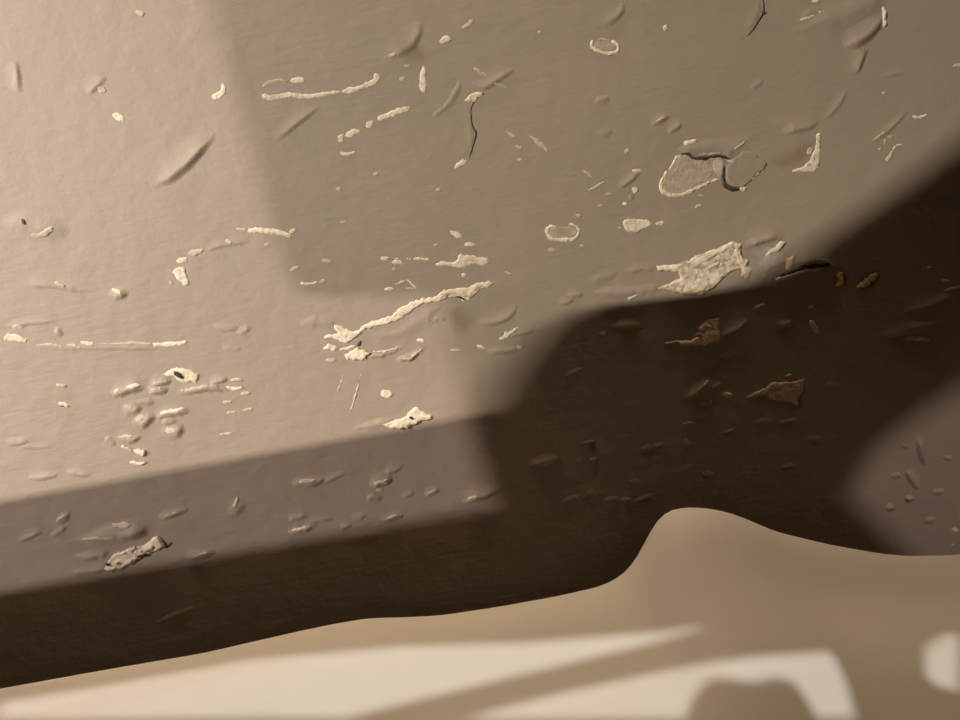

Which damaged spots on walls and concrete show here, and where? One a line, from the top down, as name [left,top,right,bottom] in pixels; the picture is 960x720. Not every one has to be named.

spalling [590,38,620,56]
crack [742,0,767,36]
peeling [792,0,888,74]
crack [454,65,514,168]
peeling [792,88,848,173]
peeling [659,133,768,209]
peeling [299,231,494,363]
spalling [544,214,584,252]
peeling [665,316,748,346]
peeling [657,223,837,309]
peeling [355,407,433,432]
peeling [69,517,173,578]